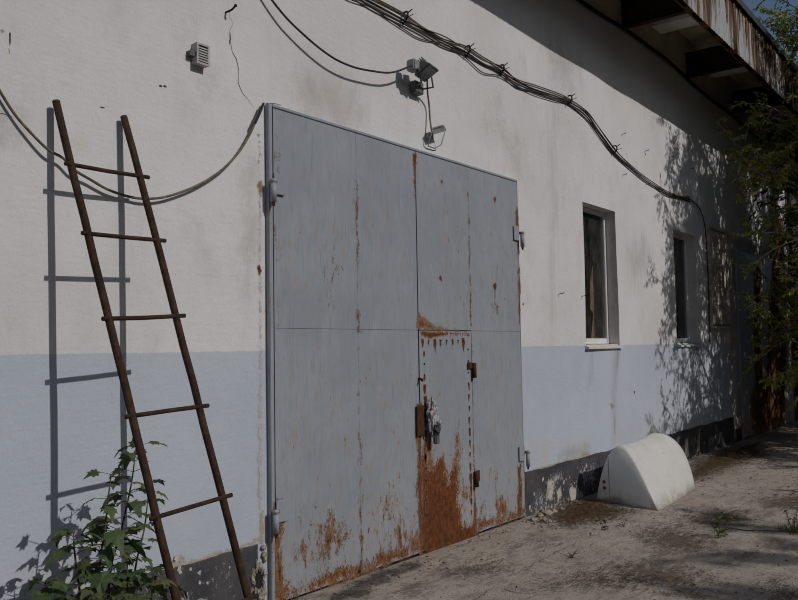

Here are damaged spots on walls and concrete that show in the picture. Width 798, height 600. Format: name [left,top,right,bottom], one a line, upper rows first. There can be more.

rust [417,214,473,362]
peeling [158,273,268,600]
rust [272,373,527,600]
peeling [527,451,597,513]